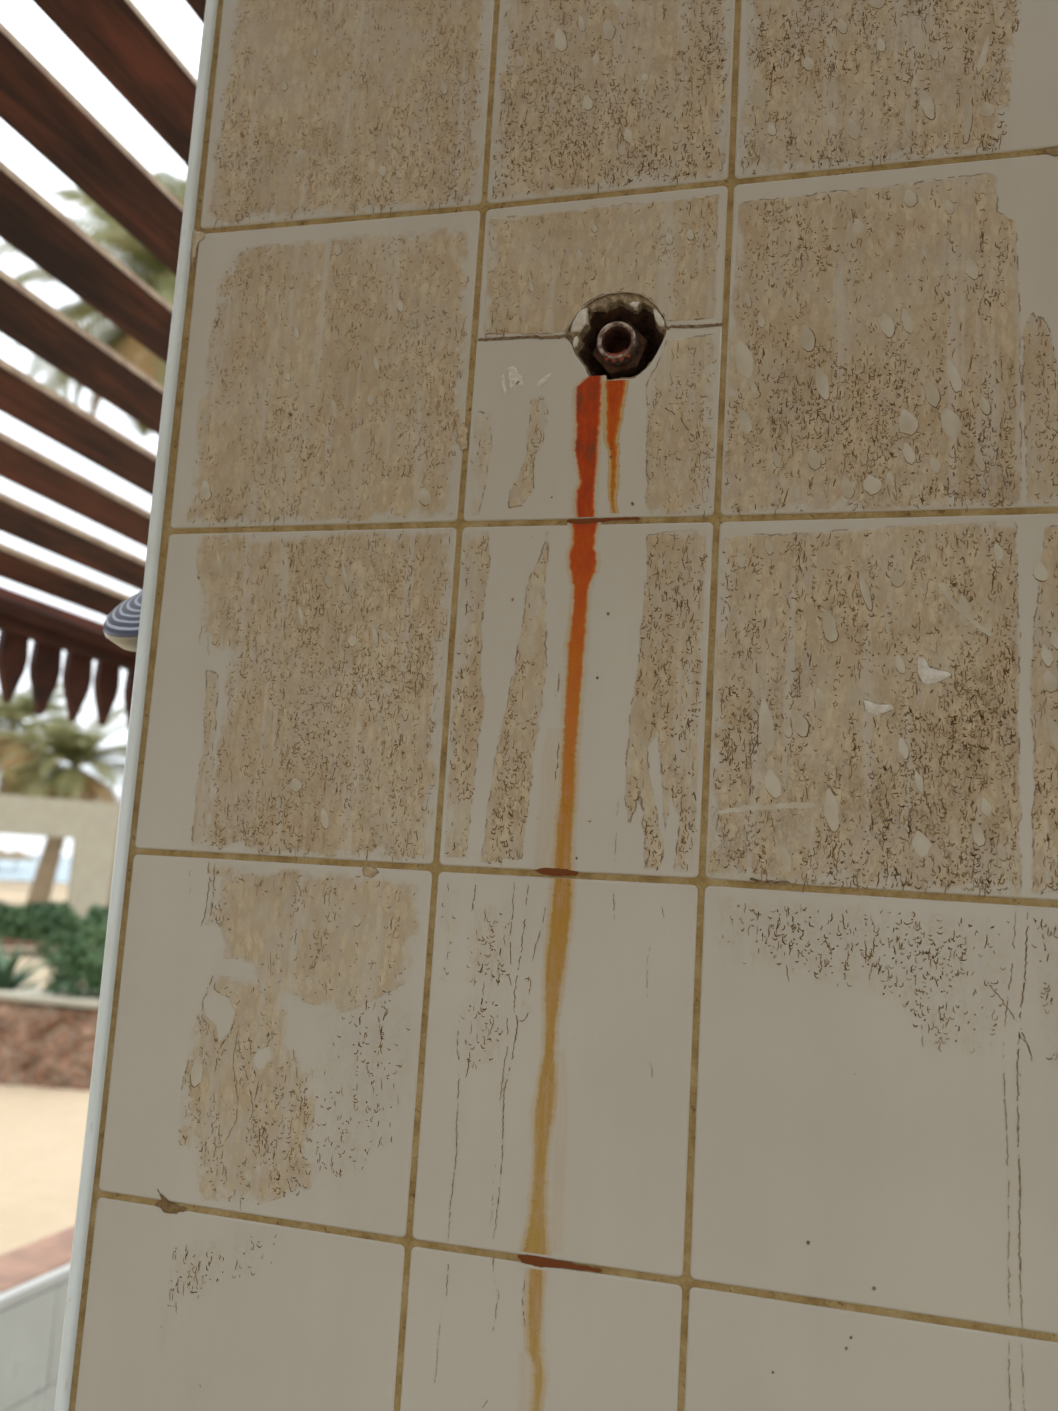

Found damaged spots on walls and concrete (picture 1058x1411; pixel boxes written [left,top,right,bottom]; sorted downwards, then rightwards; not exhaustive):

damp [214,1023,253,1141]
corrosion [516,375,641,1411]
crack [161,0,1058,1327]